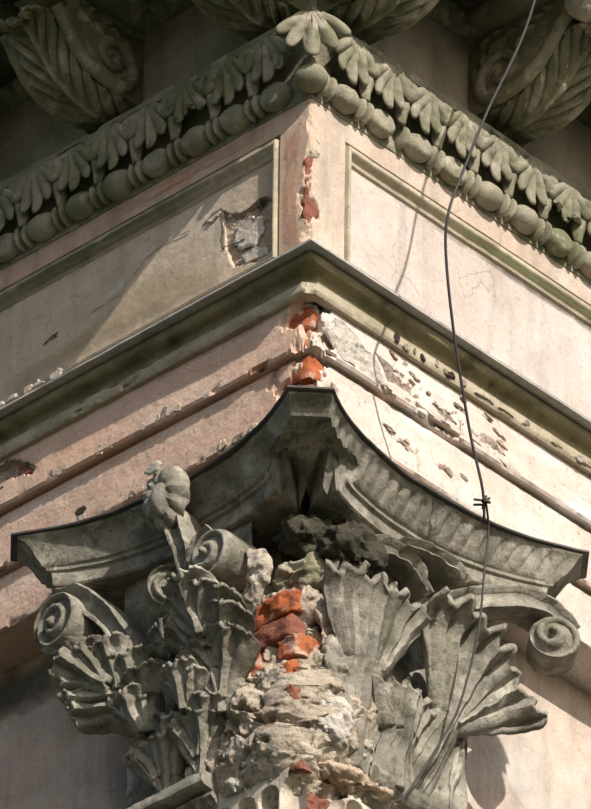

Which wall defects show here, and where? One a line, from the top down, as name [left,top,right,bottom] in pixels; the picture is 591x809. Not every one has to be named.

flaking render [202,197,272,266]
peeling [284,133,320,240]
flaking render [0,459,37,490]
flaking render [218,422,258,452]
flaking render [282,302,508,467]
spalling [204,514,399,809]